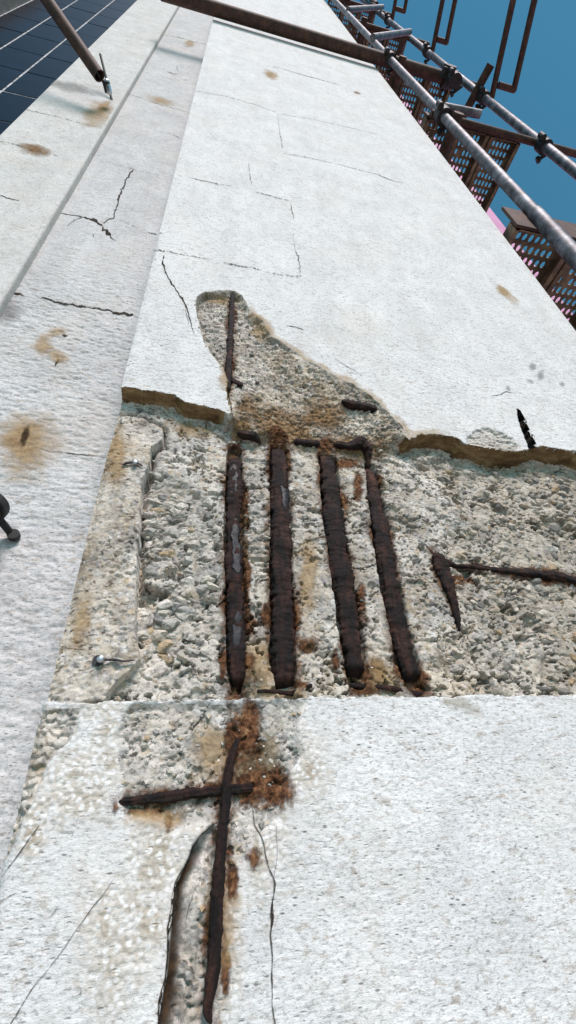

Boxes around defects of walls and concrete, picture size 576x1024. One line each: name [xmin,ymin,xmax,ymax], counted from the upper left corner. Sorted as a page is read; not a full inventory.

crack [14,292,133,316]
crack [63,168,301,334]
rust [4,423,44,460]
rust [112,398,386,996]
spalling [6,290,576,1024]
rust [331,616,433,697]
rust [429,546,576,616]
crack [253,811,277,1024]